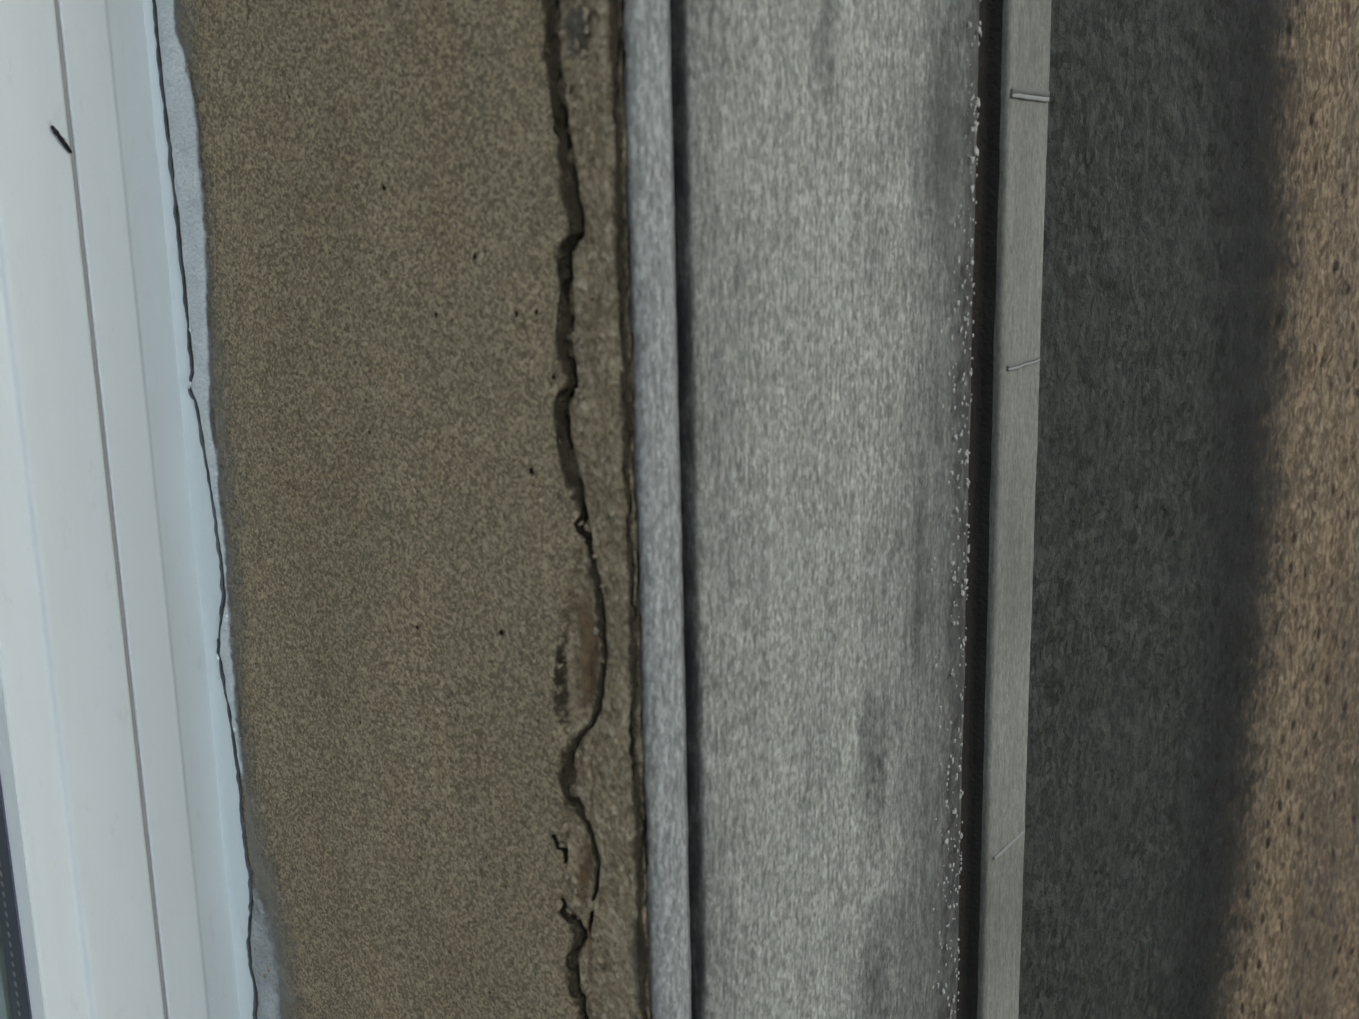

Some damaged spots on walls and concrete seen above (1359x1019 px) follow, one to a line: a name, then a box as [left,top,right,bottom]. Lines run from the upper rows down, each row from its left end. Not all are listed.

crack [152,0,257,1019]
crack [541,0,653,1019]